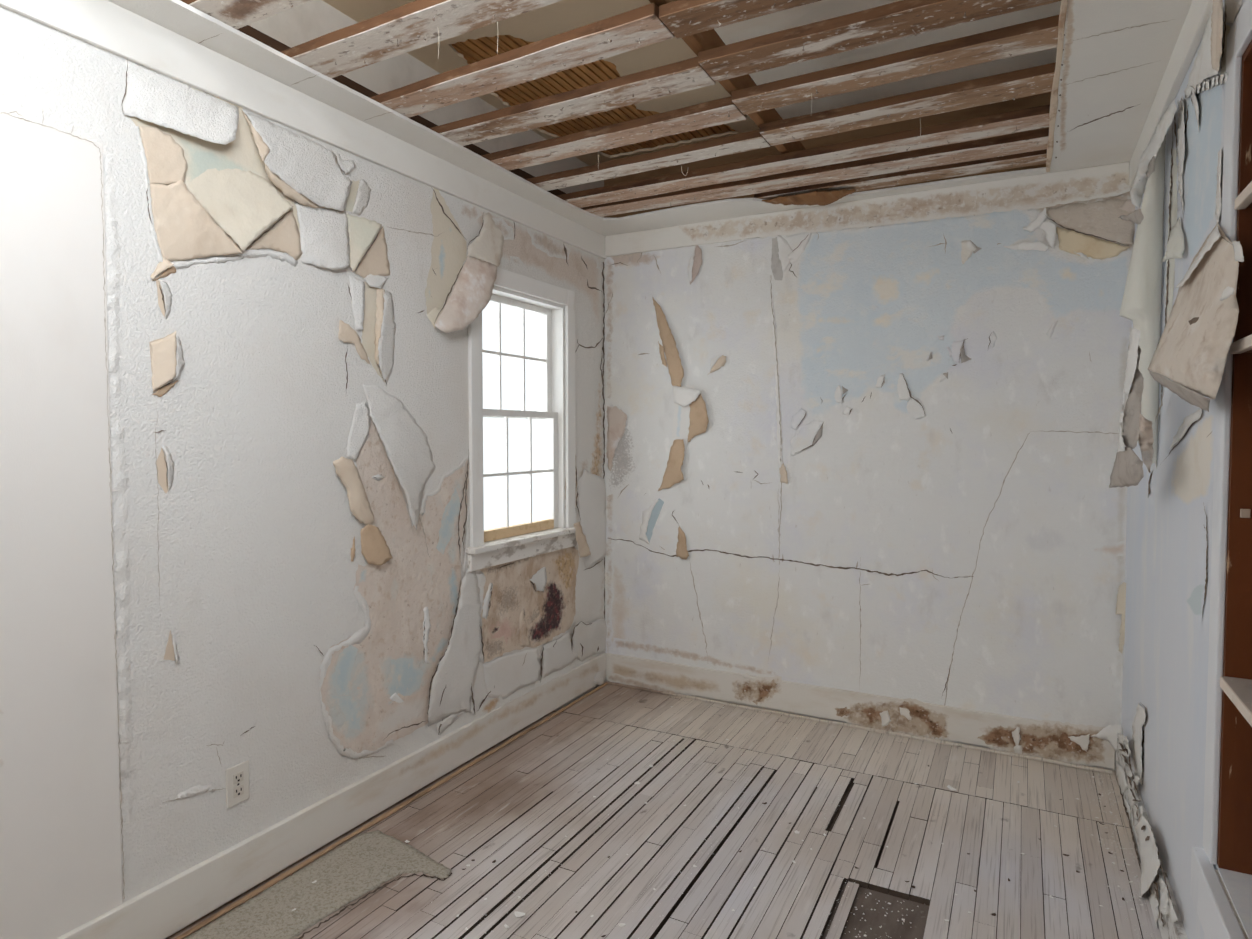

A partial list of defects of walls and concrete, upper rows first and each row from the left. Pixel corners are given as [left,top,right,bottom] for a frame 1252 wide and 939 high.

crack [1072,106,1134,130]
crack [1073,19,1175,41]
leakage [458,201,781,699]
crack [604,281,1119,705]
peeling [791,191,1135,456]
peeling [975,720,1178,927]